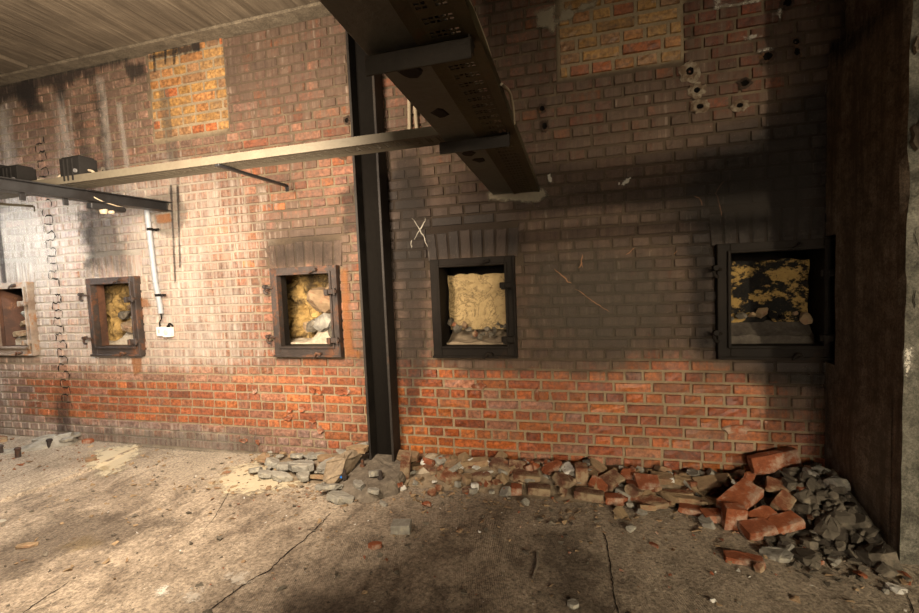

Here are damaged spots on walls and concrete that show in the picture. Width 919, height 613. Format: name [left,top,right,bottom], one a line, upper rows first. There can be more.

crack [212,519,325,608]
crack [602,529,619,613]